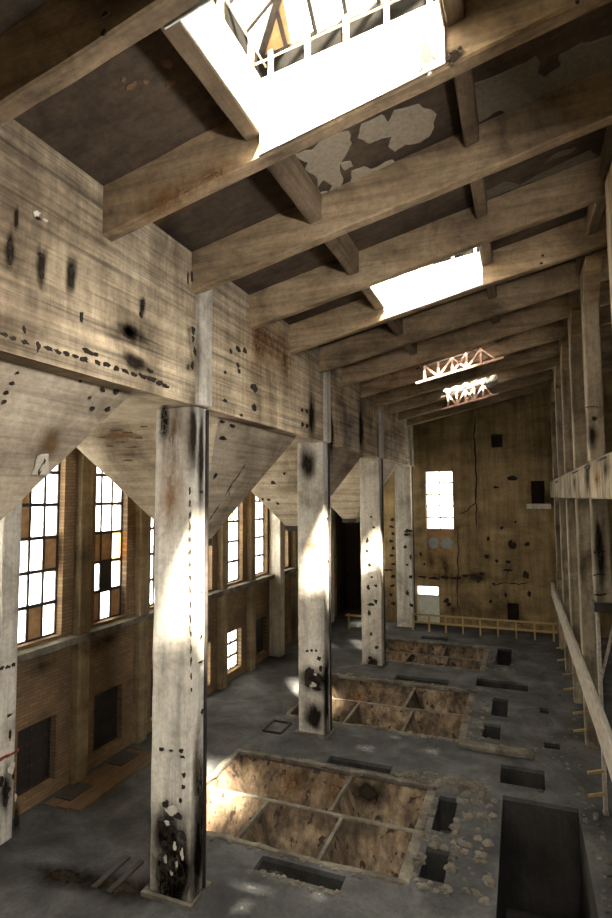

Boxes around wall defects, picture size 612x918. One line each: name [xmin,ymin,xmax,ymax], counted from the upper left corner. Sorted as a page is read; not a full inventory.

peeling [295,104,436,194]
peeling [154,772,192,901]